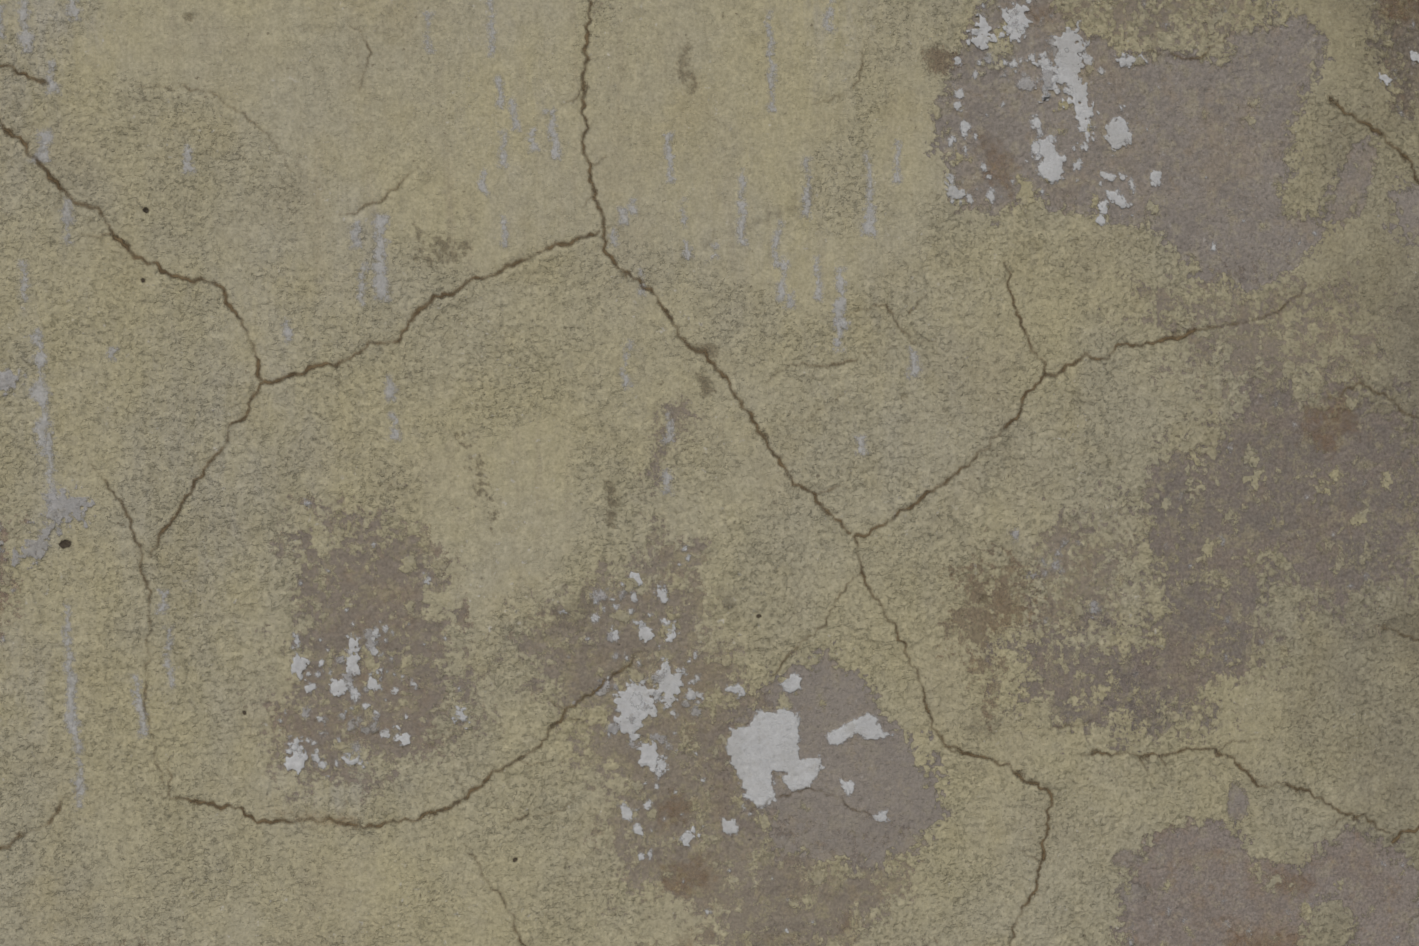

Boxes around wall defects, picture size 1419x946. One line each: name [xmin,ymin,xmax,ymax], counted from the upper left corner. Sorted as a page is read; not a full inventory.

crack [0,64,45,84]
crack [1329,97,1419,183]
crack [0,119,242,325]
crack [1004,273,1236,428]
spalling [923,0,1419,752]
crack [107,1,1053,938]
peeling [0,485,95,642]
spalling [260,495,503,804]
crack [0,805,61,849]
spalling [505,512,951,946]
crack [1091,748,1419,843]